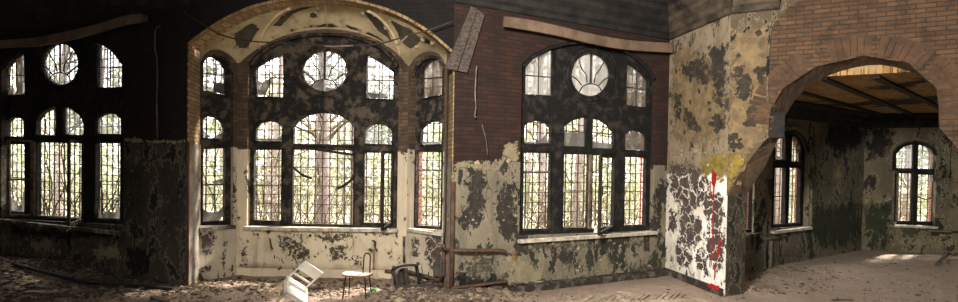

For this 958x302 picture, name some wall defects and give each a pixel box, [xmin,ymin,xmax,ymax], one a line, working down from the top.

flaking render [231,23,260,50]
flaking render [271,6,435,49]
peeling [456,145,520,235]
peeling [192,230,265,274]
peeling [275,231,394,270]
peeling [385,234,447,273]